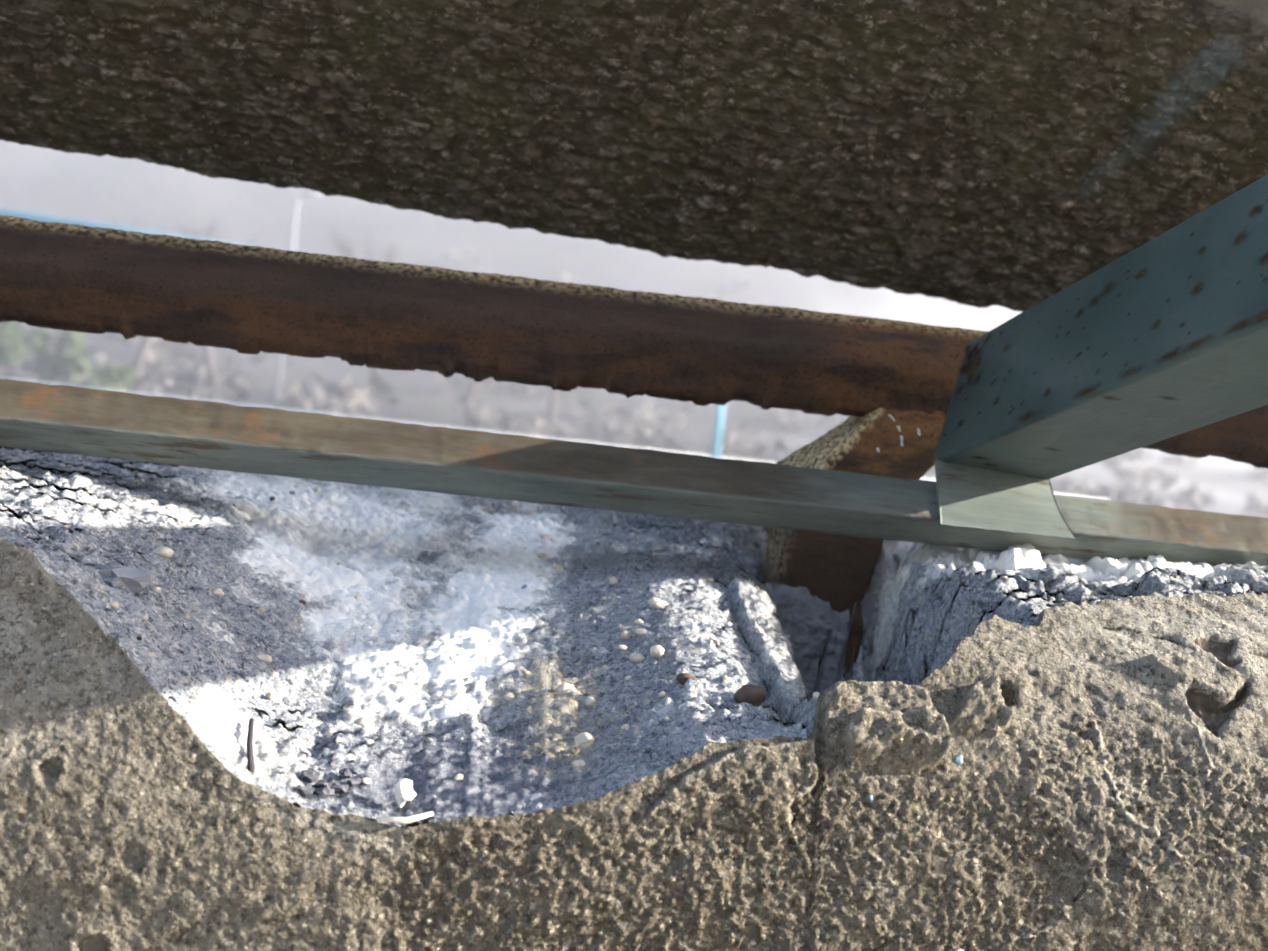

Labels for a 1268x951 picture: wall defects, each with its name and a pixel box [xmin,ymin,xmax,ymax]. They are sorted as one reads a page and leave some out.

spalling [0,447,1268,836]
crack [790,779,823,845]